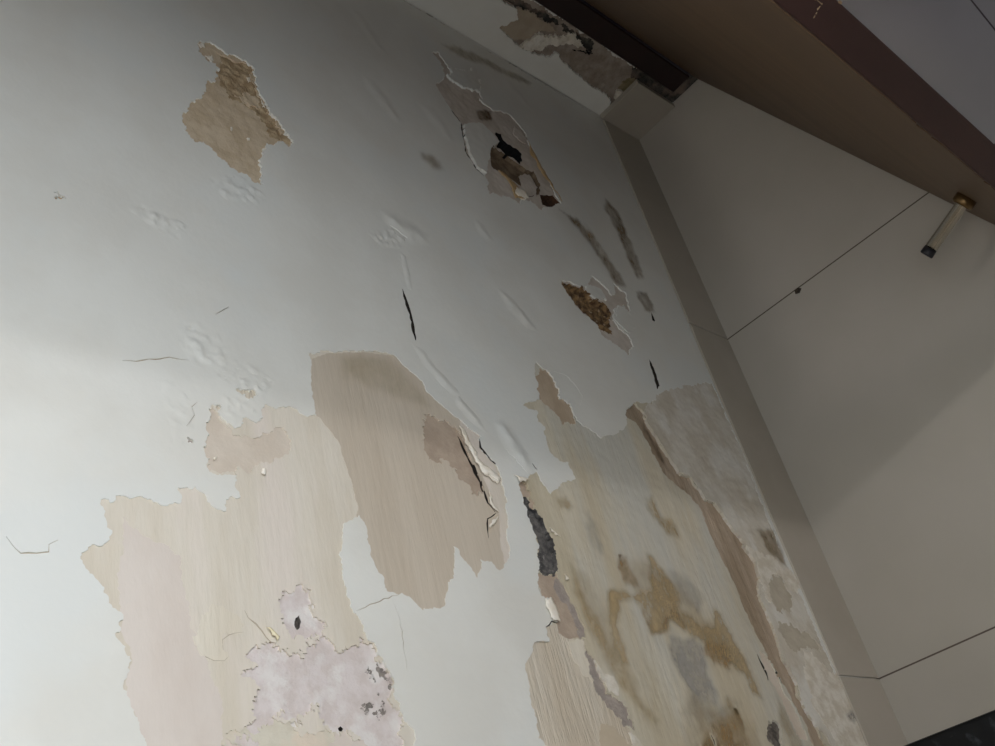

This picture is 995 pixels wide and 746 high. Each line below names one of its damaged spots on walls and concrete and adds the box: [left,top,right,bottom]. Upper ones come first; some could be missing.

flaking render [182,41,292,185]
flaking render [433,52,562,210]
flaking render [500,0,672,104]
crack [402,289,416,340]
flaking render [561,277,636,355]
peeling [80,350,510,746]
peeling [516,475,642,746]
leakage [522,363,867,746]
flaking render [625,404,824,746]